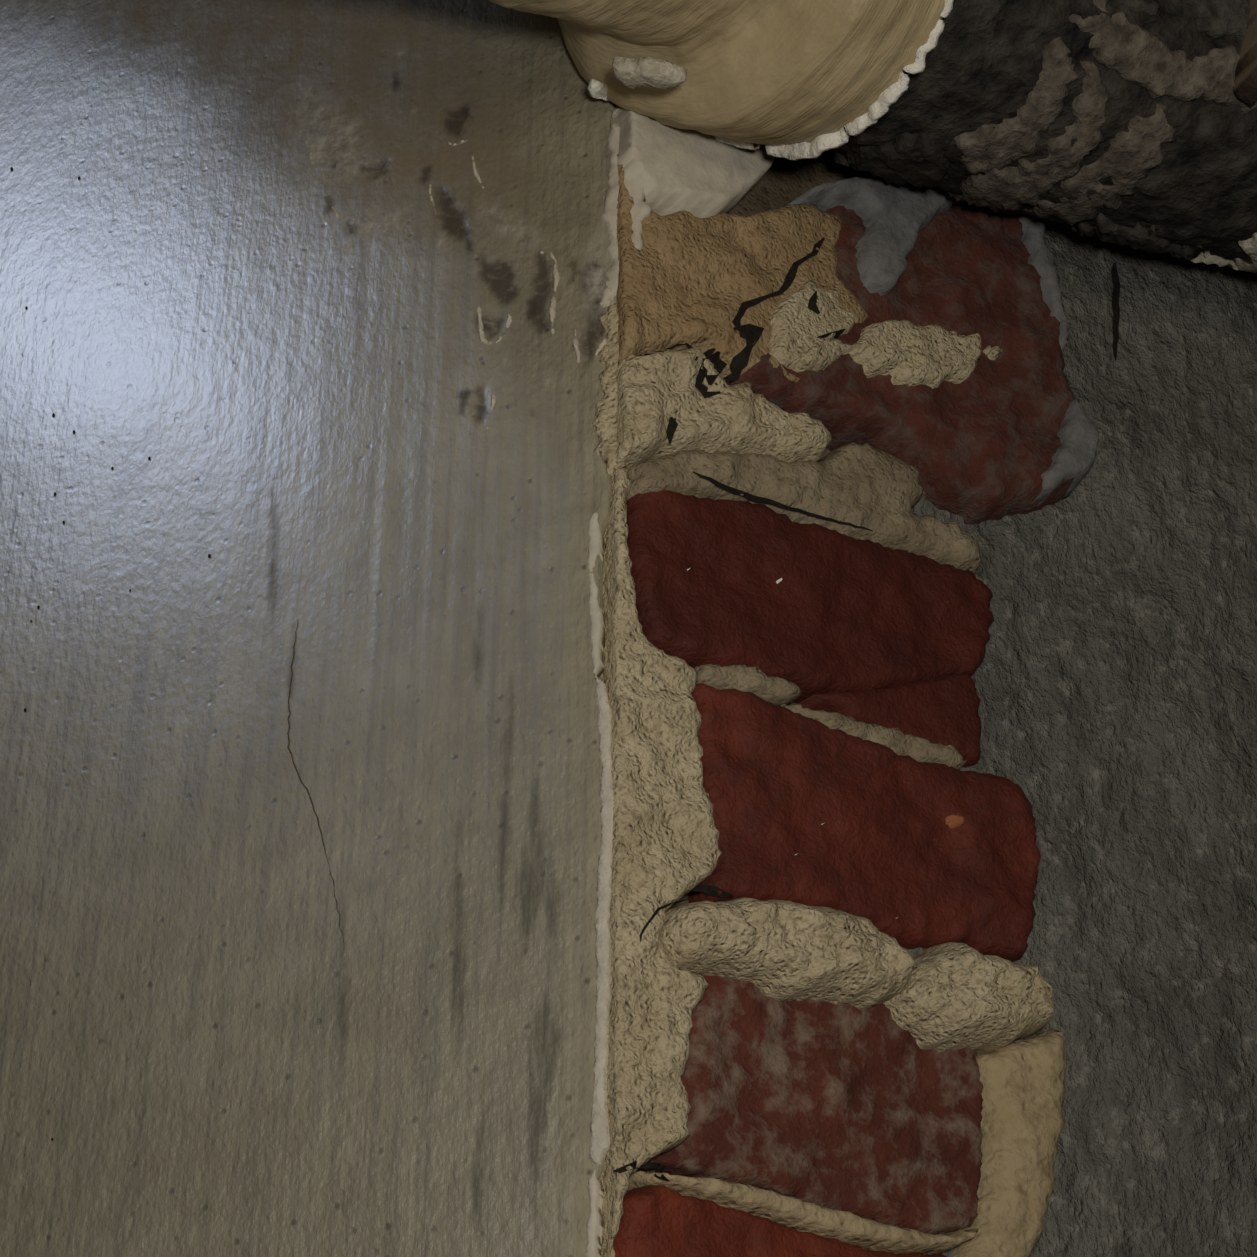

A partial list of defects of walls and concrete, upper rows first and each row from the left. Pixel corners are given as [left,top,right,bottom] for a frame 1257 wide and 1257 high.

peeling [476,263,516,344]
peeling [529,251,560,336]
crack [638,238,846,398]
spalling [983,345,1003,360]
crack [666,417,678,443]
crack [693,471,873,531]
spalling [572,0,953,1257]
crack [287,624,344,943]
peeling [945,814,965,828]